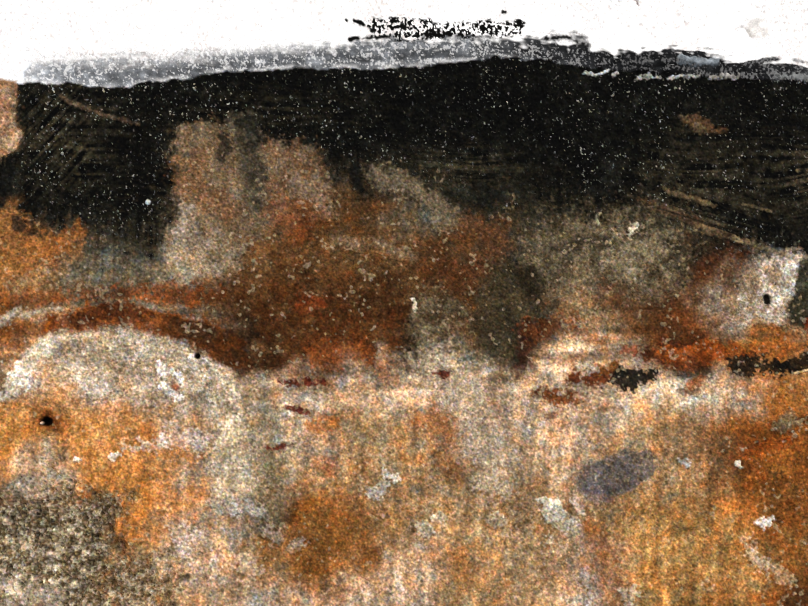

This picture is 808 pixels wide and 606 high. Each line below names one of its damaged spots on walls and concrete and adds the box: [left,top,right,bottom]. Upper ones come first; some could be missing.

damp [212,107,272,215]
corrosion [0,201,517,396]
corrosion [516,243,808,432]
corrosion [0,369,219,534]
corrosion [402,398,474,489]
corrosion [724,372,808,496]
corrosion [247,496,499,593]
corrosion [578,514,636,606]